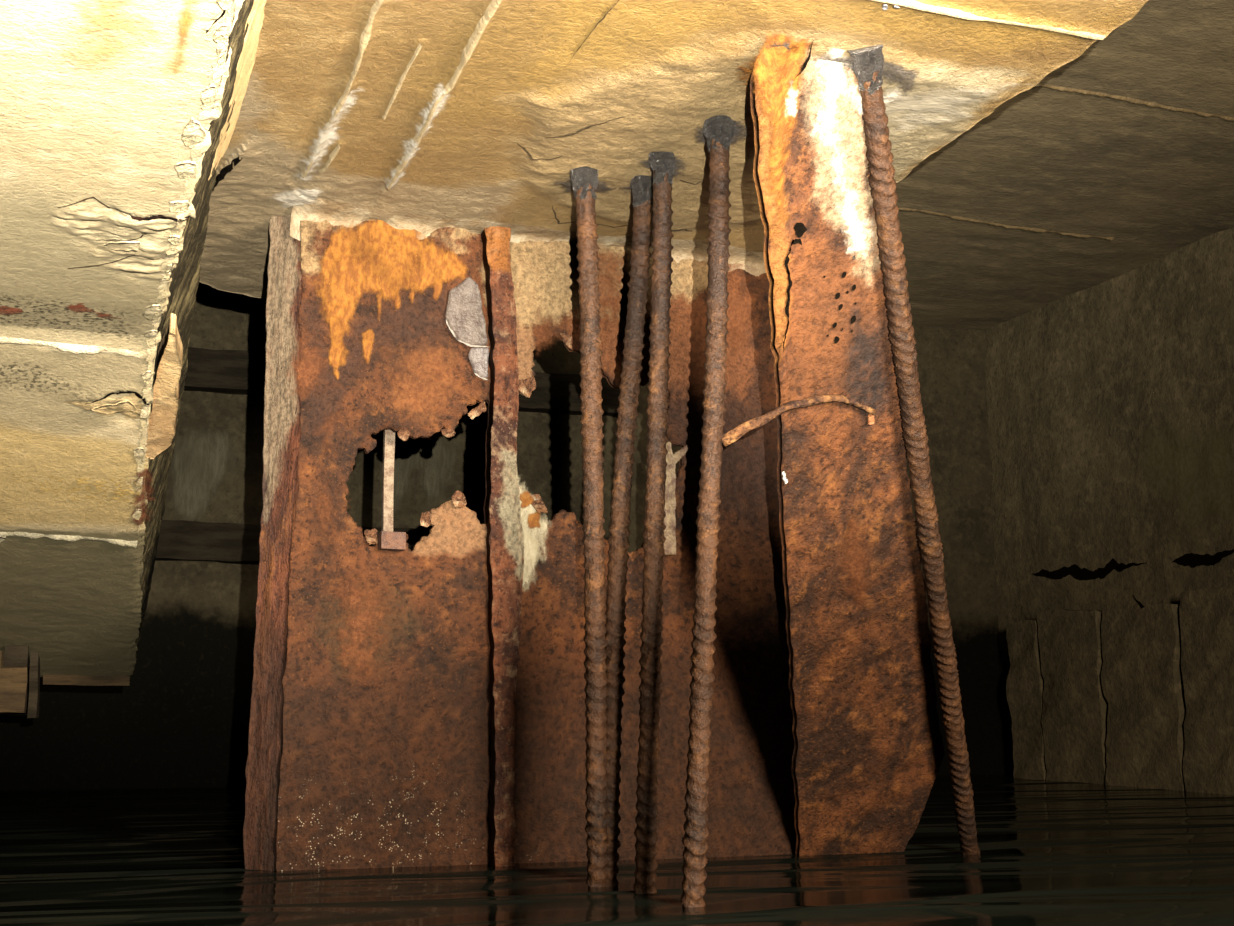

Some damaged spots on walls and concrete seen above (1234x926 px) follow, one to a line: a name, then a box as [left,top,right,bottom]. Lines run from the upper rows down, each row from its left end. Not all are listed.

crack [565,0,620,68]
corrosion [68,303,121,319]
peeling [0,0,267,536]
leakage [275,91,355,208]
corrosion [296,220,467,387]
leakage [387,85,448,189]
corrosion [597,252,628,315]
corrosion [739,34,815,209]
leakage [833,157,866,251]
spalling [570,152,675,894]
spalling [680,115,737,908]
spalling [847,44,980,855]